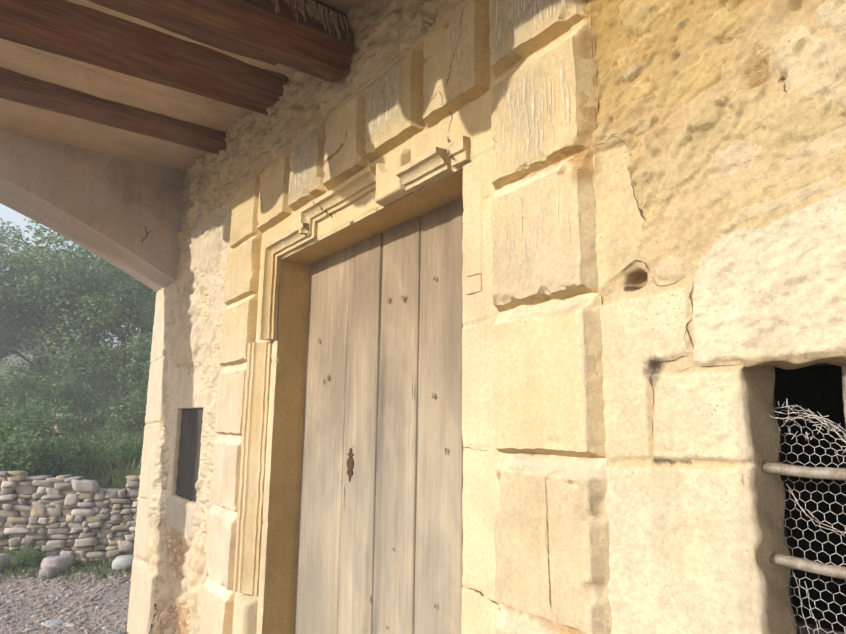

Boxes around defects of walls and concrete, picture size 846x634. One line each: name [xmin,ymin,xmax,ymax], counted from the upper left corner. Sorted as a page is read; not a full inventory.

crack [429,11,463,160]
crack [630,174,647,219]
leakage [644,358,662,374]
crack [619,260,734,437]
crack [544,474,552,608]
spalling [157,605,190,634]